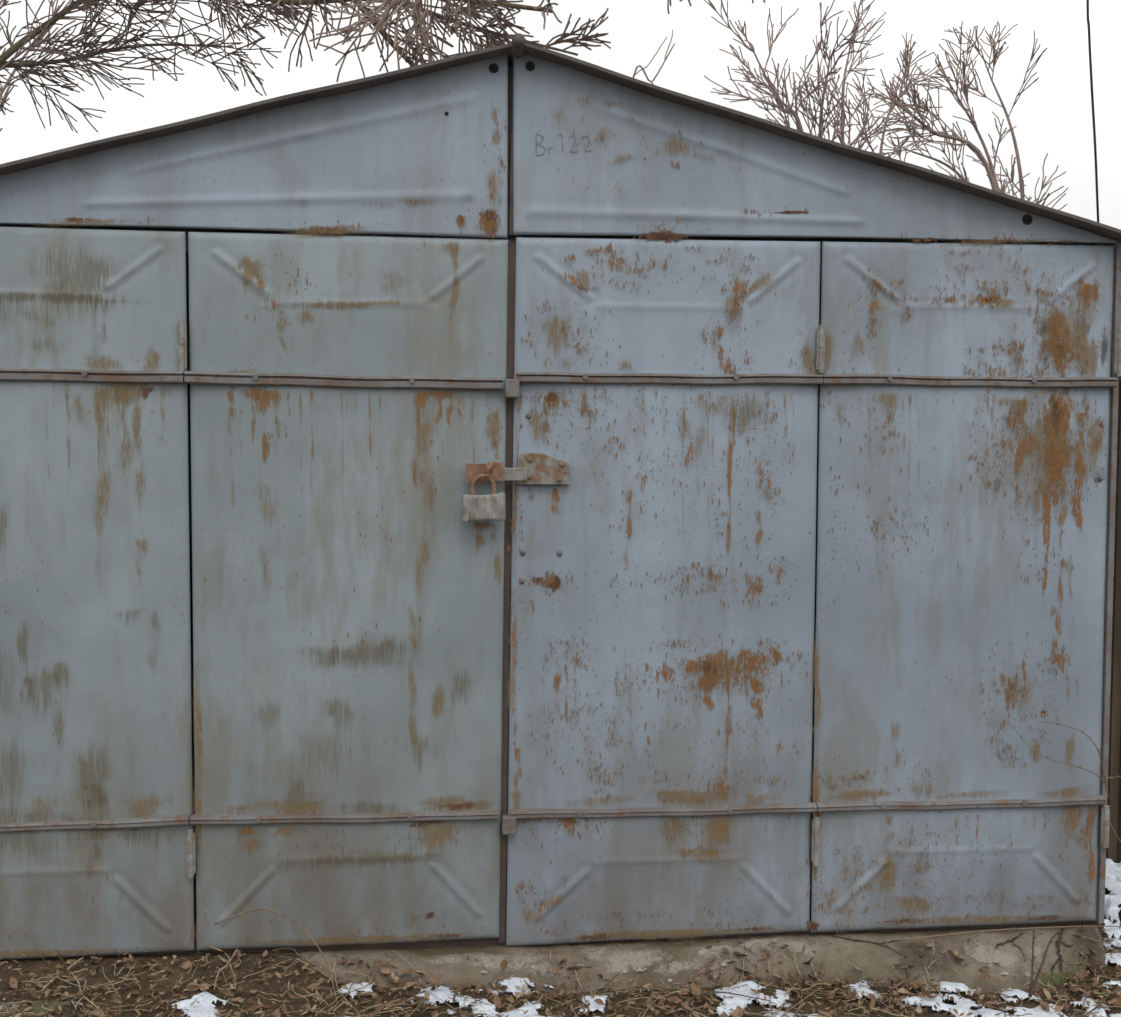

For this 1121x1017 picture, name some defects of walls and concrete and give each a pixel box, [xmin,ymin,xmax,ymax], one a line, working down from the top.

corrosion [456,102,507,240]
corrosion [403,390,461,504]
corrosion [520,217,799,608]
corrosion [788,232,1106,768]
corrosion [495,481,820,864]
corrosion [516,871,772,941]
corrosion [808,748,936,832]
corrosion [806,815,1092,933]
corrosion [1050,788,1096,880]